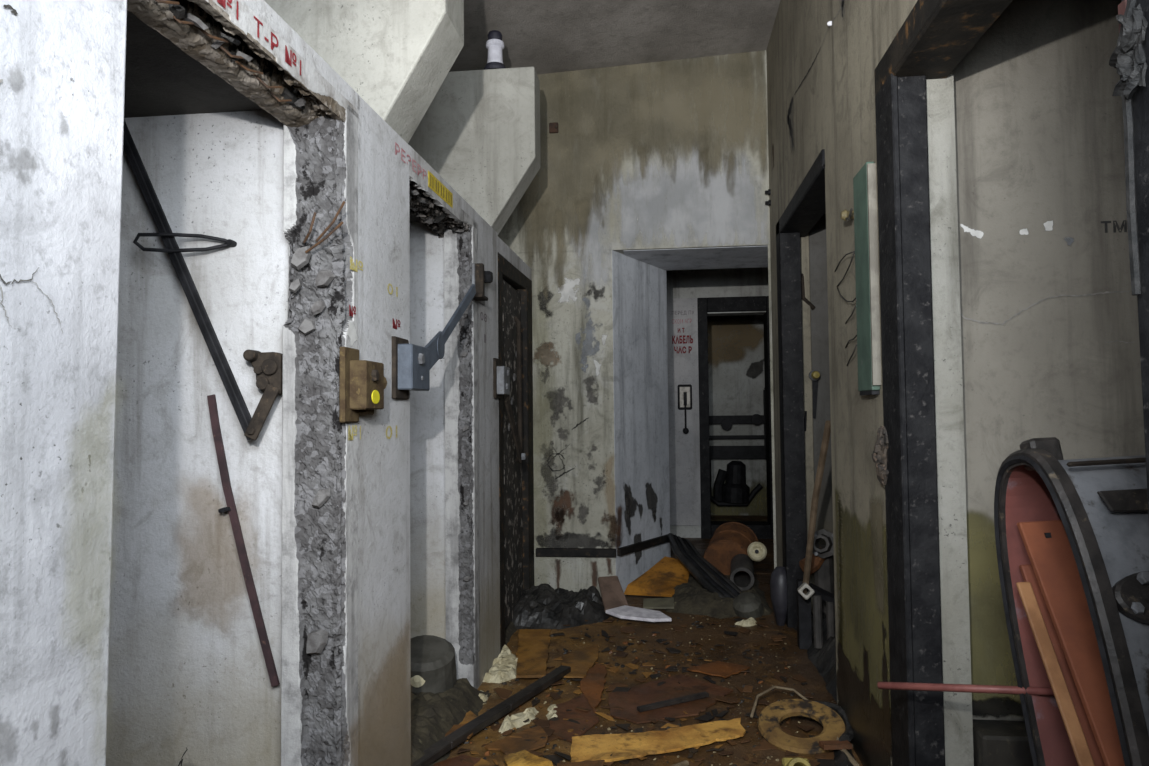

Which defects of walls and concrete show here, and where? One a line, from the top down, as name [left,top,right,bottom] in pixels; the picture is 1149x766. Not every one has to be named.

crack [0,270,63,333]
spalling [127,0,360,766]
spalling [409,161,480,689]
leakage [521,51,766,317]
peeling [624,483,663,564]
leakage [835,491,892,757]